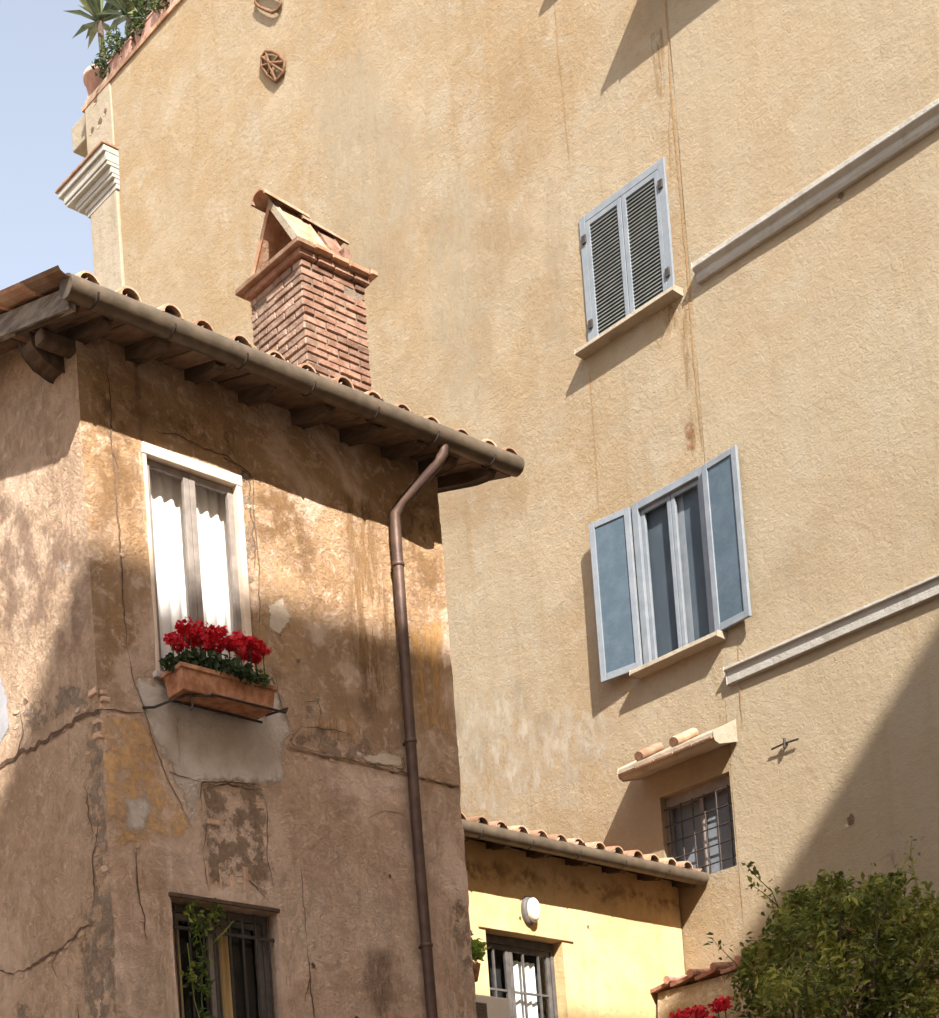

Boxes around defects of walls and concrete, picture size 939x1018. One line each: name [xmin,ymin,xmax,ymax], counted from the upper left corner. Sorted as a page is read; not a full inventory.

crack [664,0,703,451]
crack [0,371,202,827]
crack [156,431,261,633]
crack [0,817,98,978]
peeling [12,687,116,1018]
peeling [130,670,405,893]
crack [300,864,315,1018]